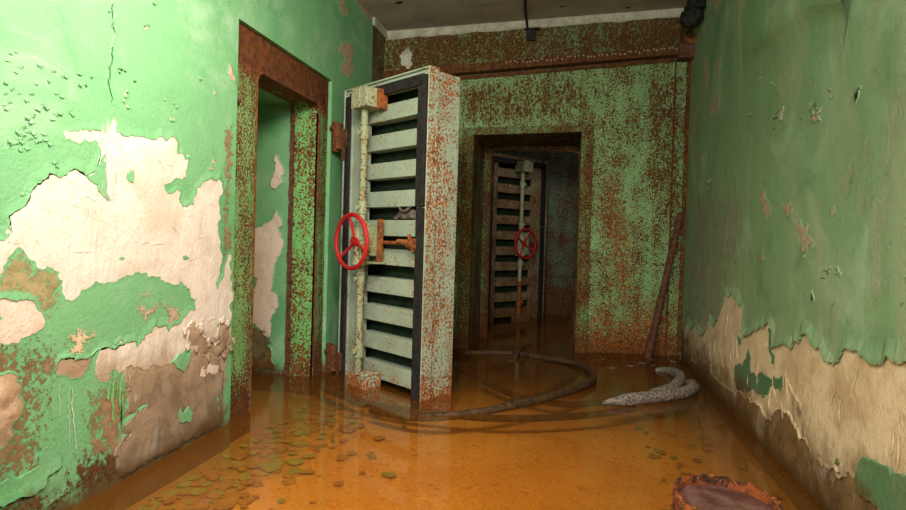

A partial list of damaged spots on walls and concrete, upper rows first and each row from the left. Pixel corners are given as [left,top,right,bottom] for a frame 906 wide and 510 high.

crack [108,0,118,101]
peeling [339,40,355,80]
corrosion [385,19,682,70]
corrosion [459,65,609,143]
peeling [0,62,236,479]
peeling [252,208,285,371]
corrosion [238,25,329,373]
corrosion [586,66,687,367]
peeling [757,172,815,261]
peeling [670,284,906,510]